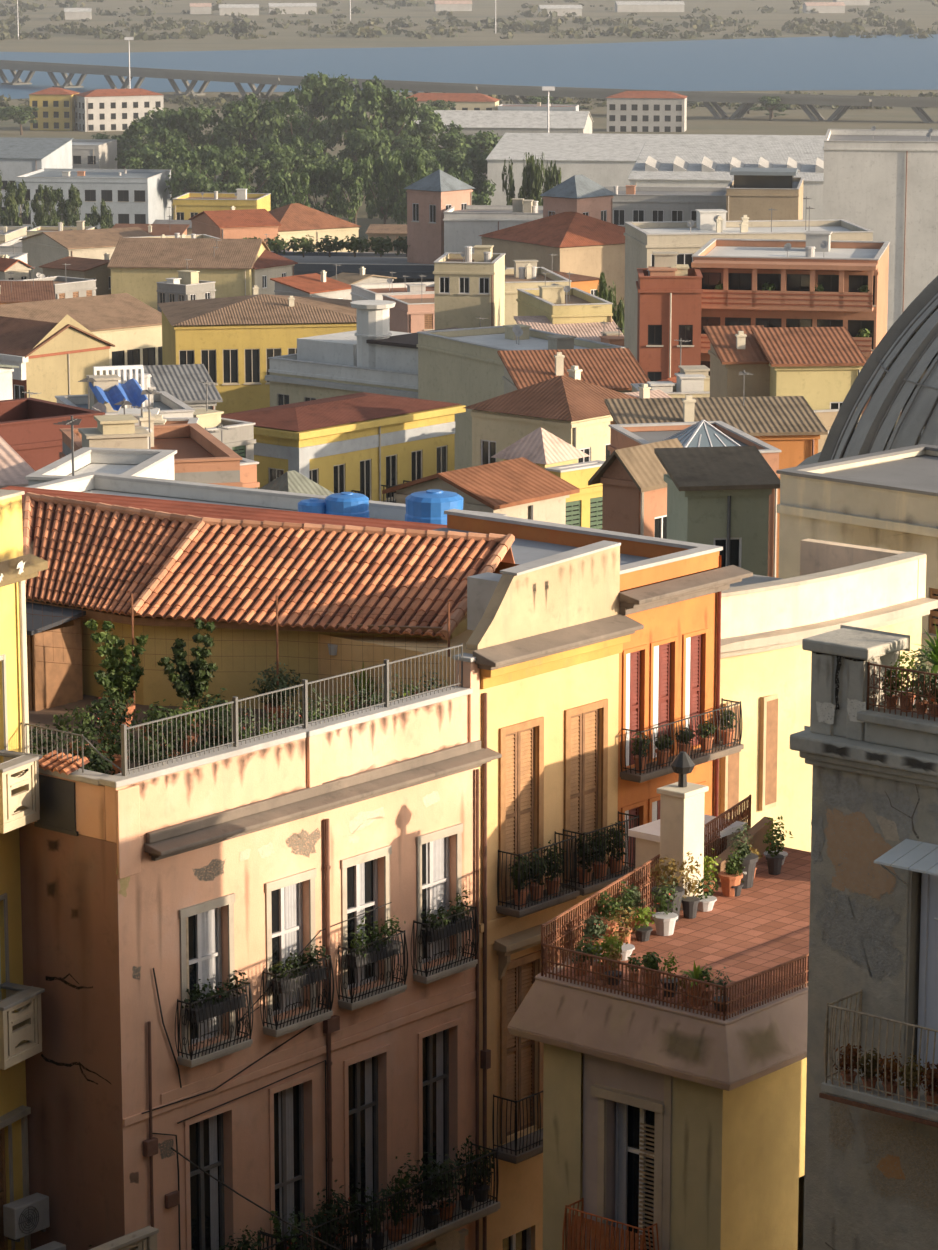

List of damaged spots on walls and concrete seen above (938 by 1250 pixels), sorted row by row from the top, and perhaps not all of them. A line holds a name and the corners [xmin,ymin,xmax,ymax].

leakage [214,741,304,771]
peeling [192,828,321,881]
peeling [824,806,896,901]
crack [45,973,93,990]
crack [41,1054,111,1085]